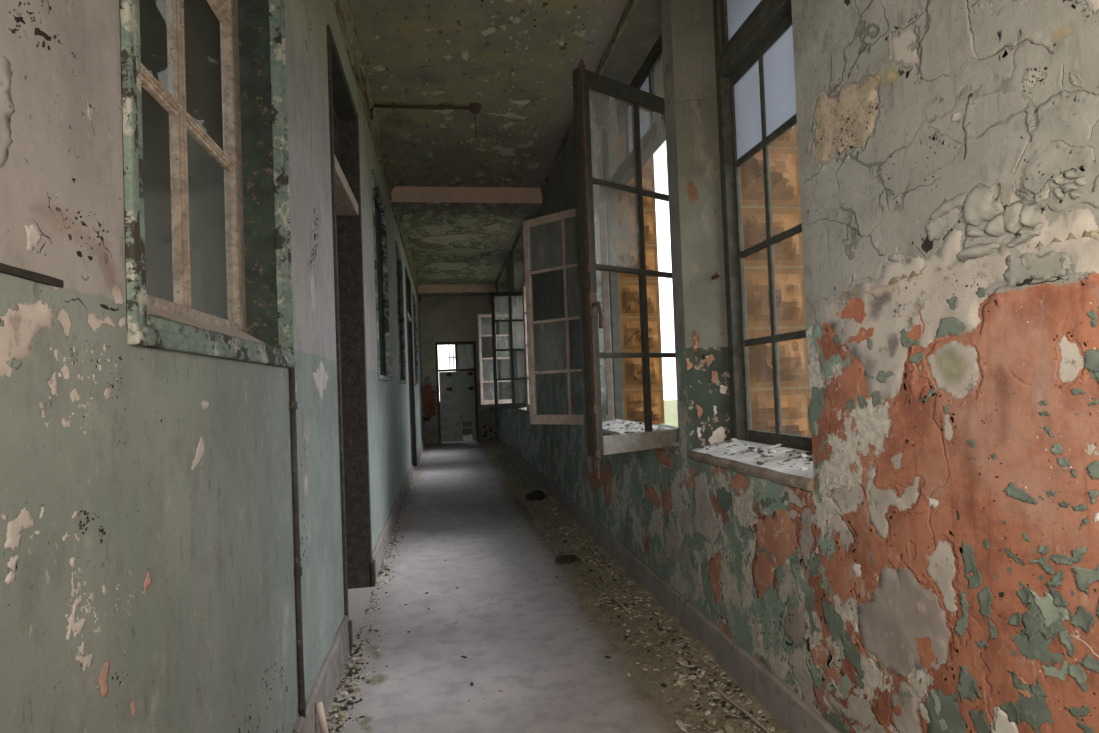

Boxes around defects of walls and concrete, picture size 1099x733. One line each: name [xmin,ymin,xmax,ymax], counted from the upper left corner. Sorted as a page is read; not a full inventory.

spalling [804,14,953,188]
crack [844,0,1099,91]
crack [806,93,980,262]
crack [1085,174,1099,210]
flaking render [0,192,125,434]
peeling [684,351,728,394]
peeling [806,165,1099,475]
spalling [0,507,46,585]
flaking render [583,387,1054,733]
peeling [1032,389,1078,530]
peeling [1029,546,1087,607]
peeling [1072,490,1099,530]